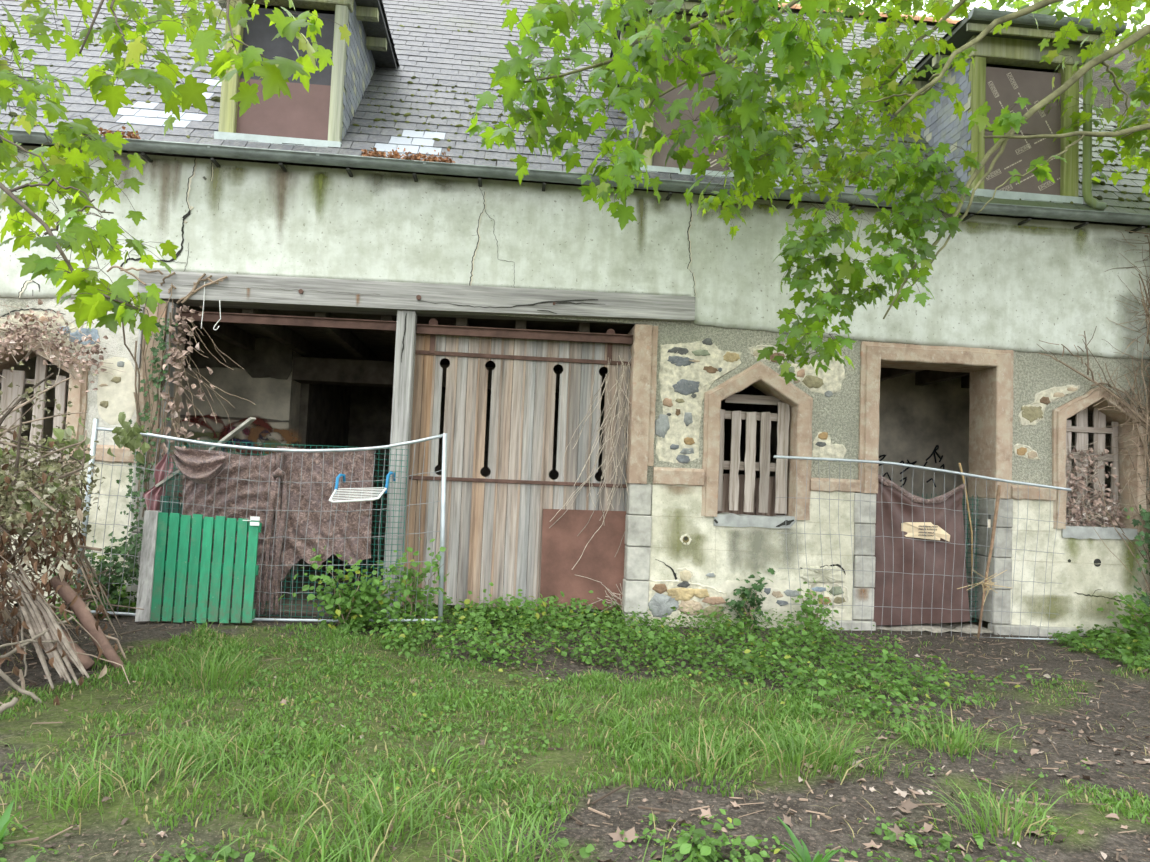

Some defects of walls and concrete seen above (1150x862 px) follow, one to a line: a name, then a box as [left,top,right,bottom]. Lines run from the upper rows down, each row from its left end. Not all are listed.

leakage [211,166,244,198]
leakage [314,173,328,198]
crack [120,158,380,295]
crack [401,185,598,362]
crack [687,197,697,295]
flaking render [655,338,846,464]
spalling [1018,385,1080,426]
spalling [1013,443,1040,460]
spalling [647,567,849,624]